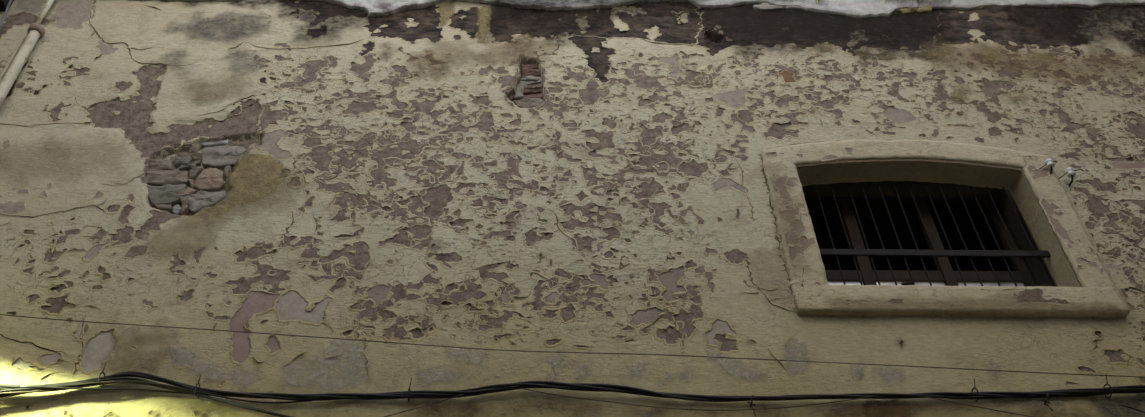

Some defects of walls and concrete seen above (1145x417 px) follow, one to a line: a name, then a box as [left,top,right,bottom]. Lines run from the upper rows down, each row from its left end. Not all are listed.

peeling [0,0,98,41]
damp [476,0,949,60]
damp [1009,5,1145,53]
peeling [5,41,119,123]
peeling [14,229,38,277]
peeling [10,352,65,374]
peeling [703,318,741,354]
peeling [1064,330,1145,388]